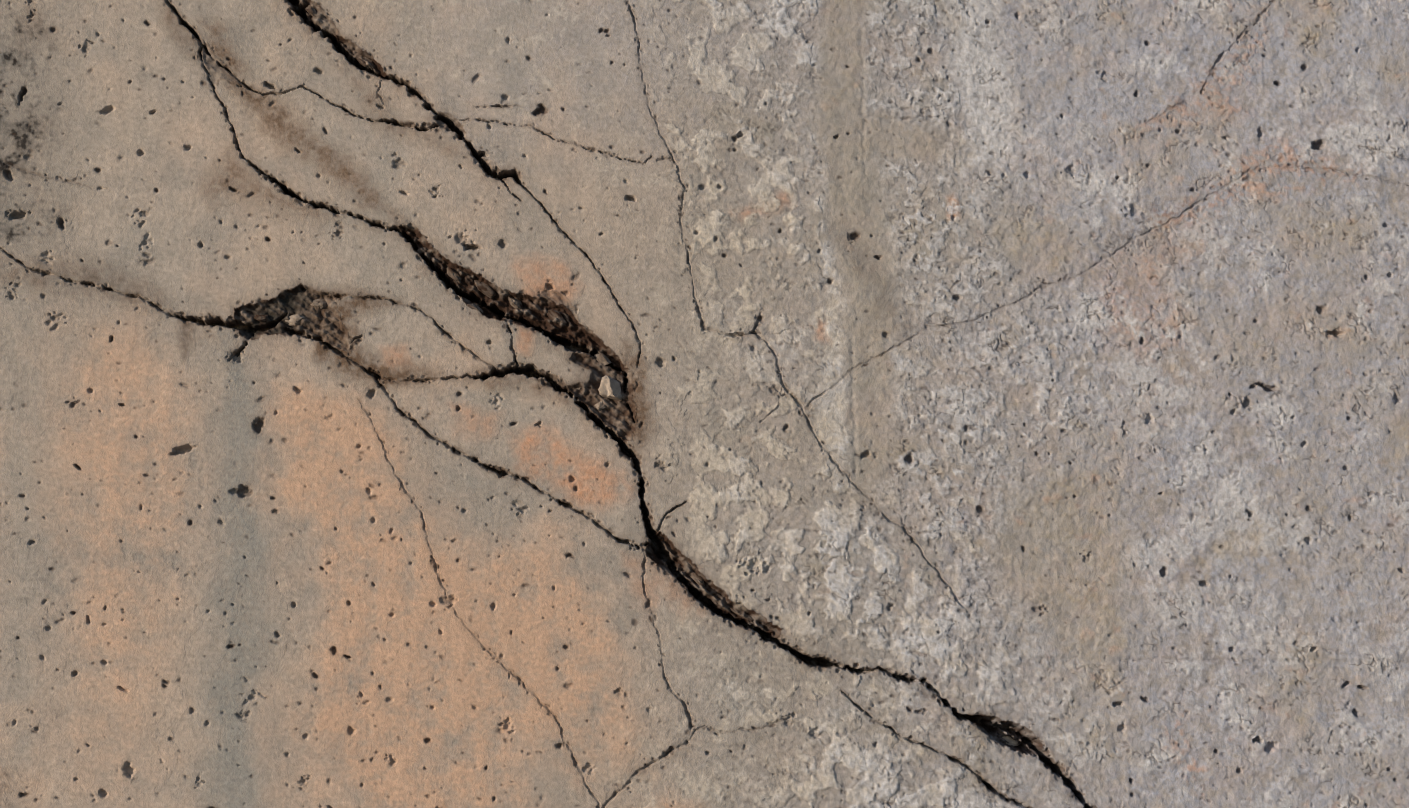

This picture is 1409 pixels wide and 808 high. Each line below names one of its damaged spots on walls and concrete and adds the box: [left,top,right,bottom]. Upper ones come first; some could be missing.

crack [1143,0,1277,124]
crack [1357,145,1409,162]
crack [0,0,1099,808]